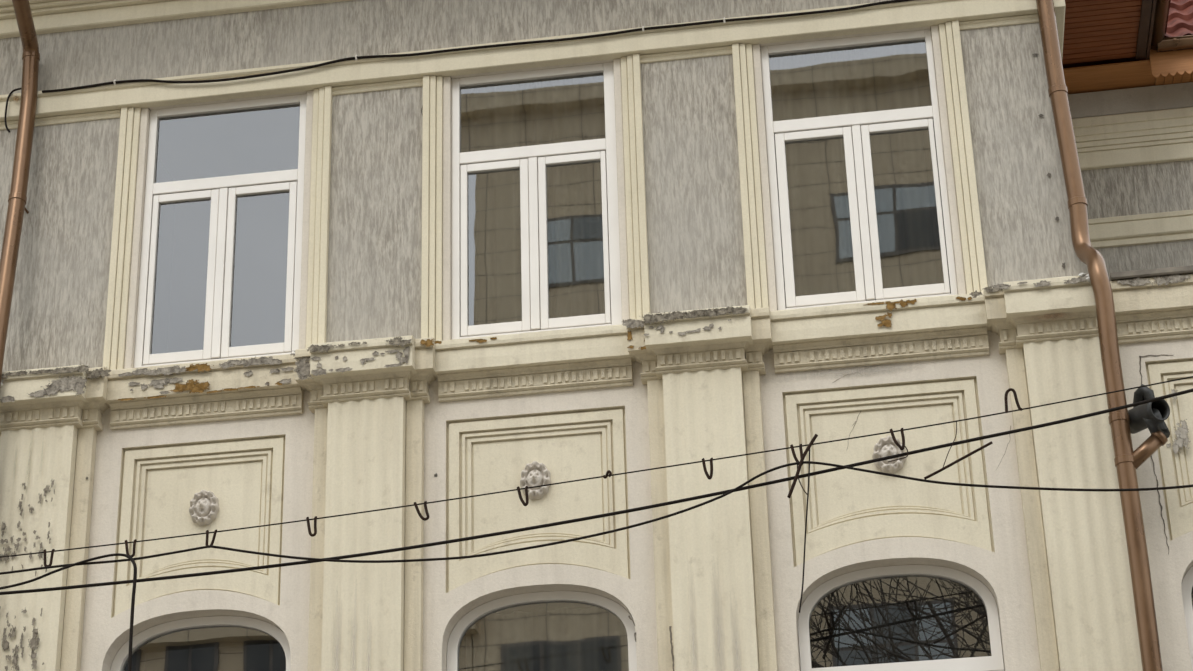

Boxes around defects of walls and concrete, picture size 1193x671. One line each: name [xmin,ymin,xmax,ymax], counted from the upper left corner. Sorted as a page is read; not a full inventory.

spalling [622,306,747,336]
rust [864,299,917,328]
peeling [0,364,197,403]
rust [169,363,214,393]
peeling [207,337,442,394]
peeling [0,479,55,576]
peeling [2,608,44,671]